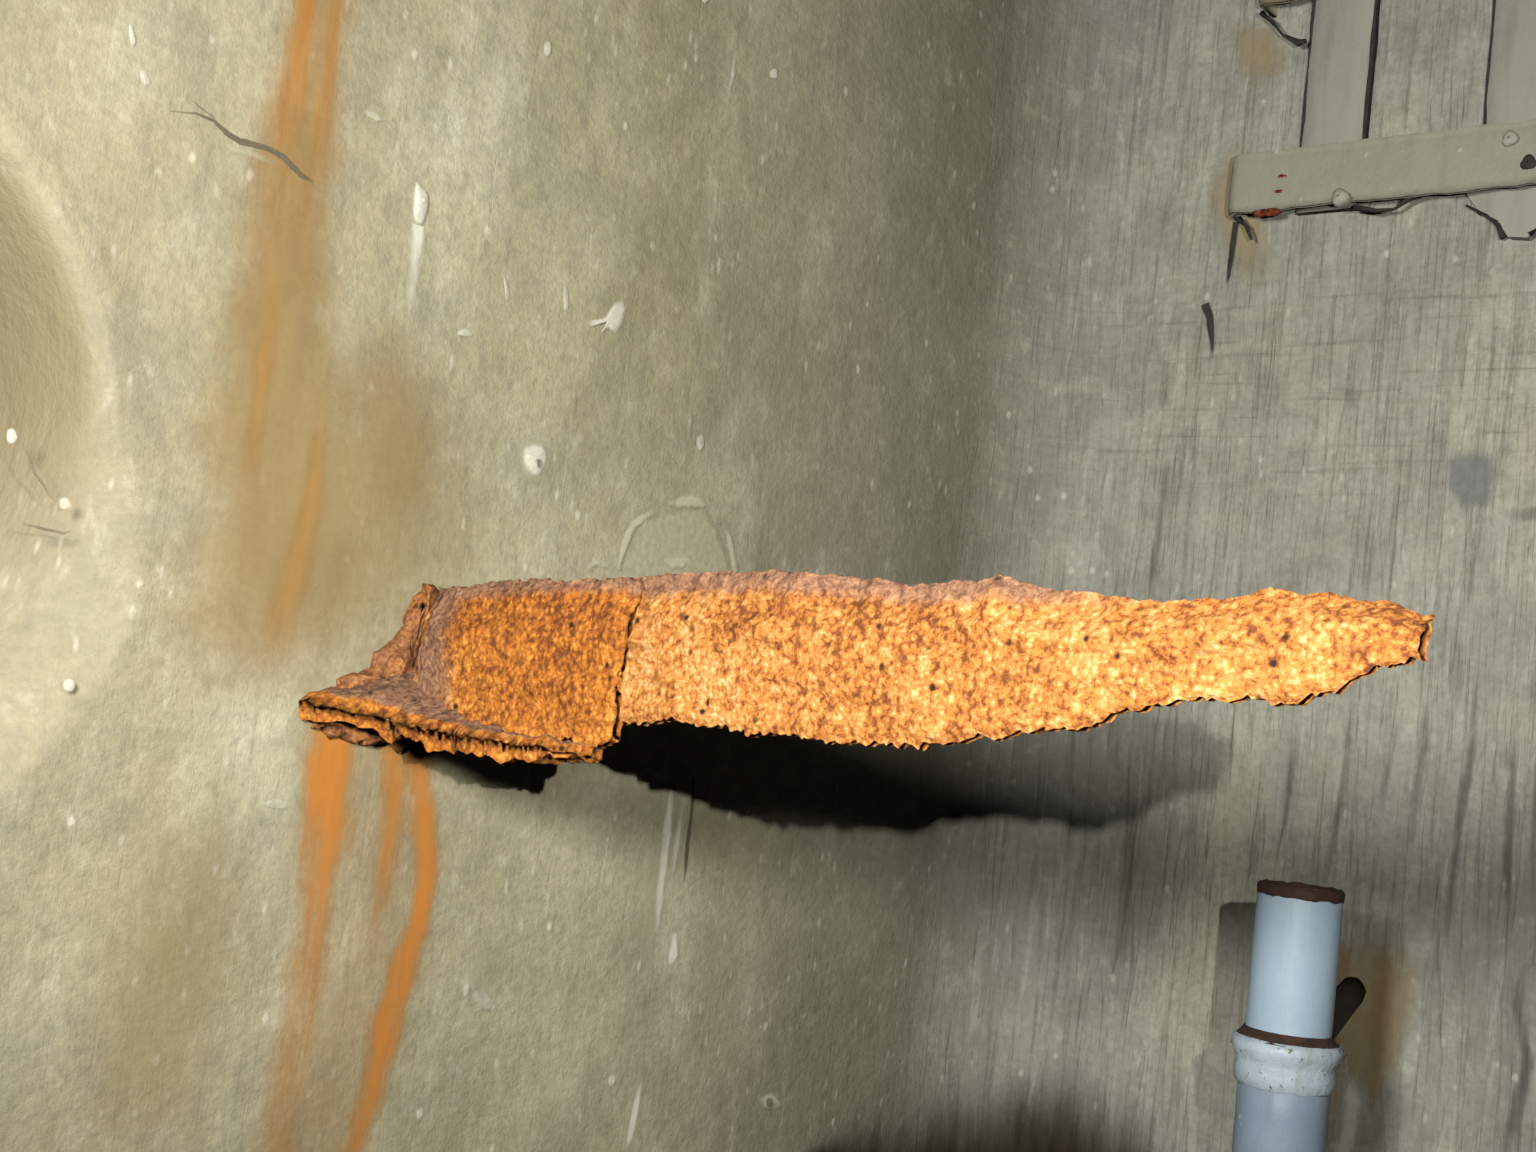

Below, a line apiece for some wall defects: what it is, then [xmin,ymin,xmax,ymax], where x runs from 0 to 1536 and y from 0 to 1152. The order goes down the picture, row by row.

crack [196,113,309,180]
corrosion [281,0,314,131]
crack [28,457,67,535]
corrosion [417,577,643,749]
corrosion [302,728,351,947]
corrosion [349,737,436,1152]